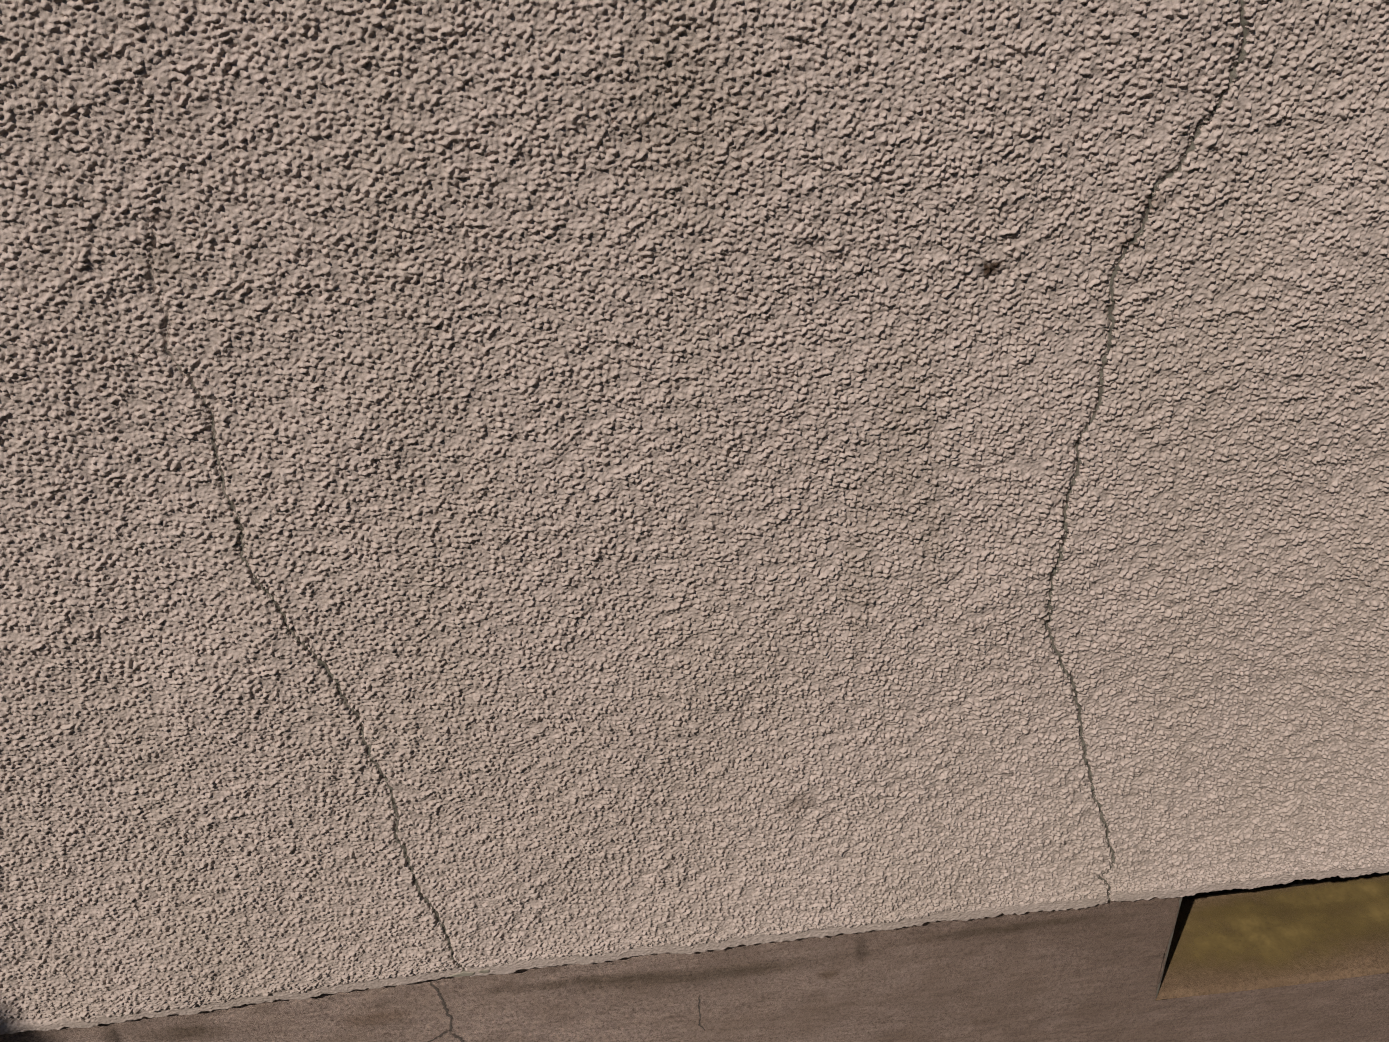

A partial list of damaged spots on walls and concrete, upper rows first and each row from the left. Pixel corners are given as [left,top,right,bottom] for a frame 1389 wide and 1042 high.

crack [99,323,465,1042]
crack [1045,0,1248,900]